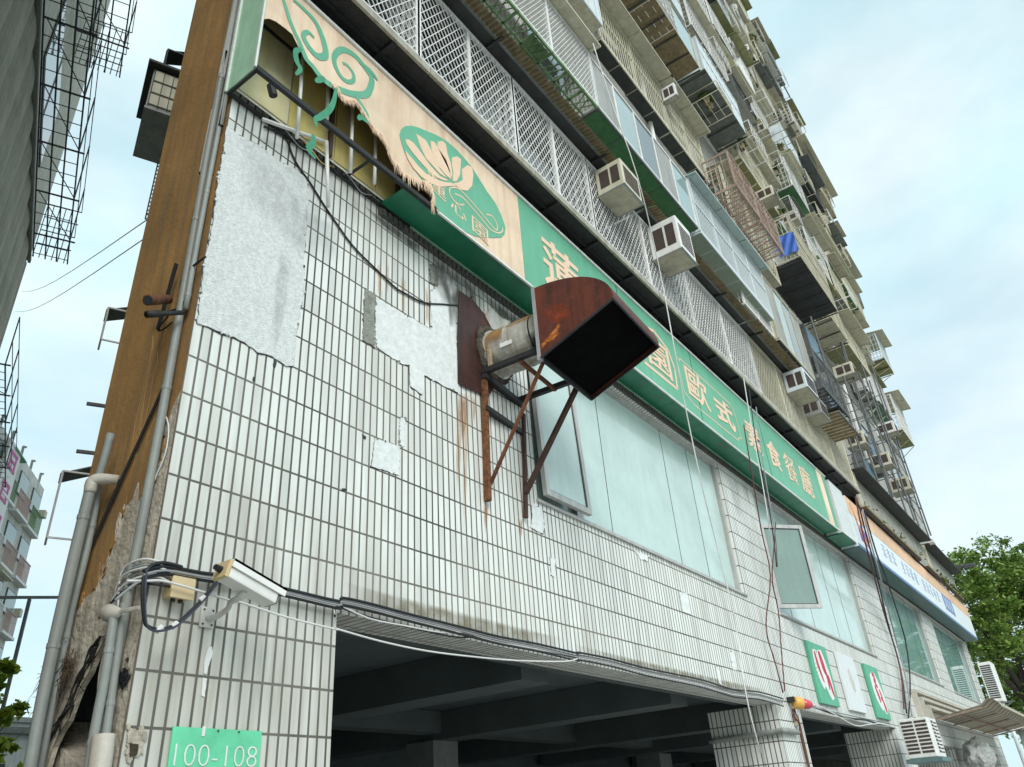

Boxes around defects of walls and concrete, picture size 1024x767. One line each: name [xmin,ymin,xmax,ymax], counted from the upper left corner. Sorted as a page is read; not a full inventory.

peeling [196,126,309,367]
flaking render [362,417,407,475]
peeling [362,264,458,395]
peeling [45,391,181,767]